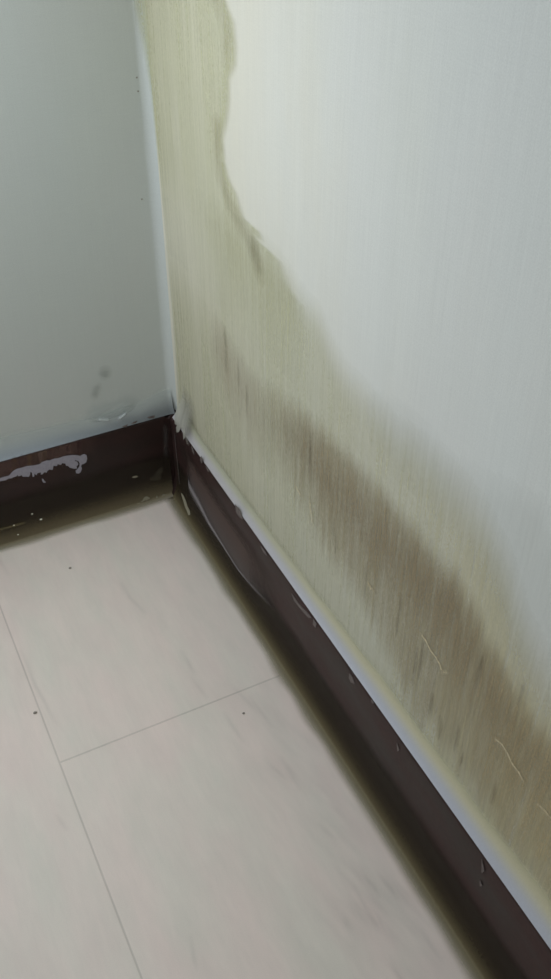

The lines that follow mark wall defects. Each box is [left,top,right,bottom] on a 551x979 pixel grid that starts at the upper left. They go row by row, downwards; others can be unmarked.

peeling [0,454,87,483]
leakage [292,426,551,906]